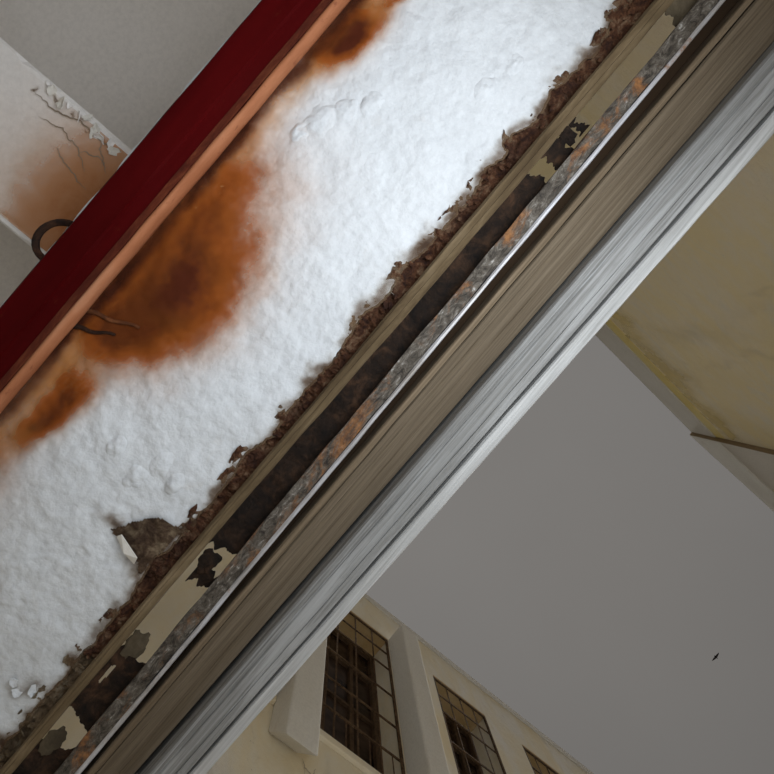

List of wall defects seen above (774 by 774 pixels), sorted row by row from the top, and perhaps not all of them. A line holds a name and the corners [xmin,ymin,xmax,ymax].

crack [35,92,121,189]
spalling [46,80,120,156]
corrosion [0,0,402,449]
spalling [386,0,654,300]
corrosion [541,117,590,171]
spalling [0,286,400,769]
corrosion [185,174,546,588]